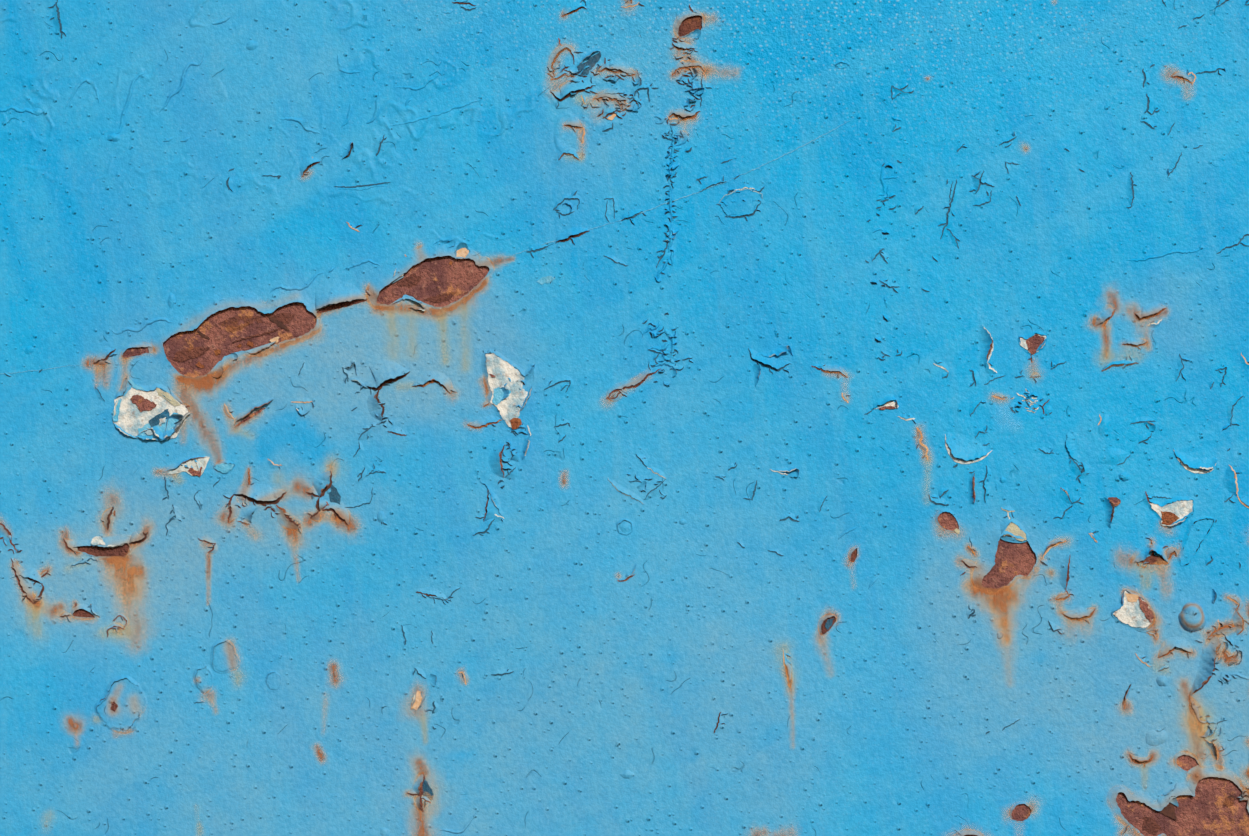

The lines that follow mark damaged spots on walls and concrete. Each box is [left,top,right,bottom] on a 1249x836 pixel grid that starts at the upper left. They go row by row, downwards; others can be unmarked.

corrosion [673,4,705,39]
corrosion [365,240,510,317]
peeling [94,377,191,441]
corrosion [121,289,323,434]
peeling [468,349,537,431]
corrosion [934,506,1052,626]
peeling [1100,497,1121,528]
peeling [1142,491,1217,567]
corrosion [817,613,837,636]
peeling [1111,588,1159,640]
corrosion [1106,714,1249,836]
peeling [1203,739,1219,760]